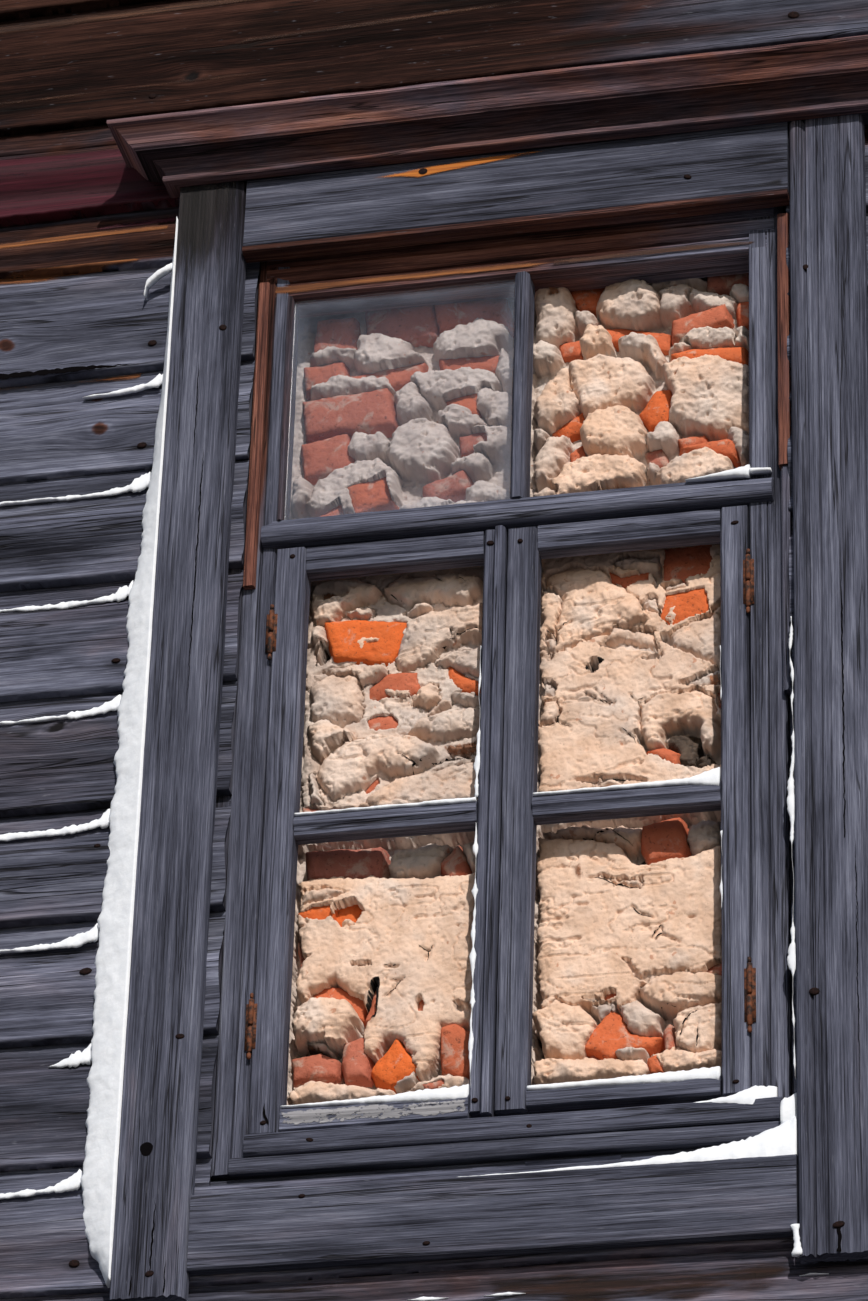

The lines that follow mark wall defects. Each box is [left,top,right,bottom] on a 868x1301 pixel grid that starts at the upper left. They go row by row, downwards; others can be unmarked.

spalling [657,735,717,768]
crack [840,566,861,1097]
spalling [306,1044,332,1058]